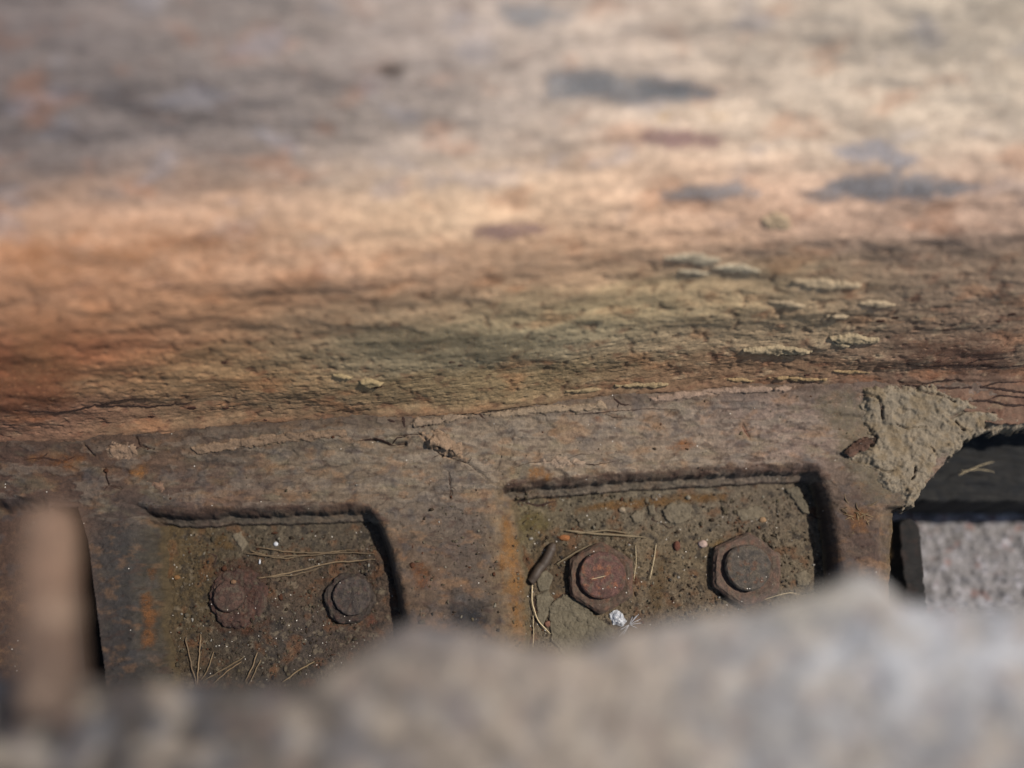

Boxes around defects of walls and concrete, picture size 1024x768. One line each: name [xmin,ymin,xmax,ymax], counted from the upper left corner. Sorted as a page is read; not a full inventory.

peeling [664,252,761,276]
peeling [768,300,806,308]
peeling [792,278,898,319]
peeling [742,344,813,356]
peeling [829,333,880,348]
crack [359,417,623,495]
spalling [845,436,875,458]
rust [0,500,1024,768]